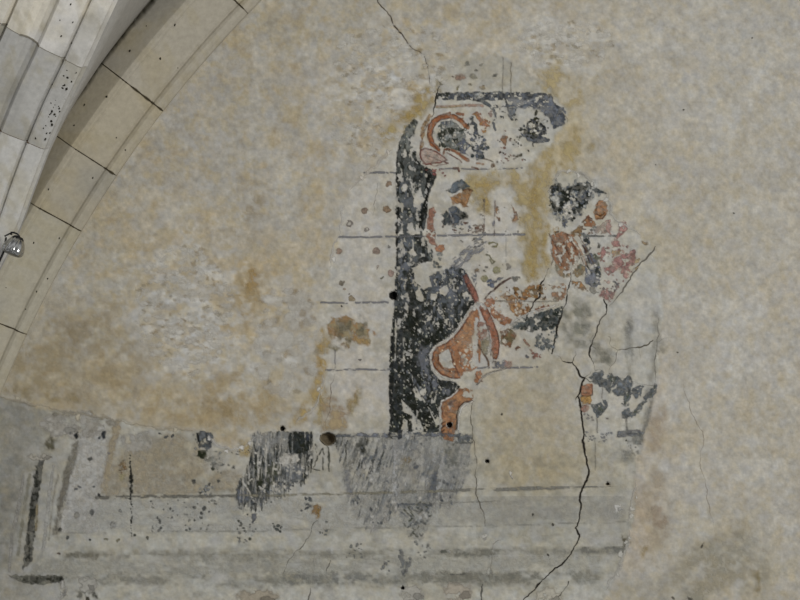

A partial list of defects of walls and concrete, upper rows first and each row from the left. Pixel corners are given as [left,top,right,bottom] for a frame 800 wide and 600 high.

crack [377,0,441,112]
damp [511,148,553,276]
crack [523,247,655,600]